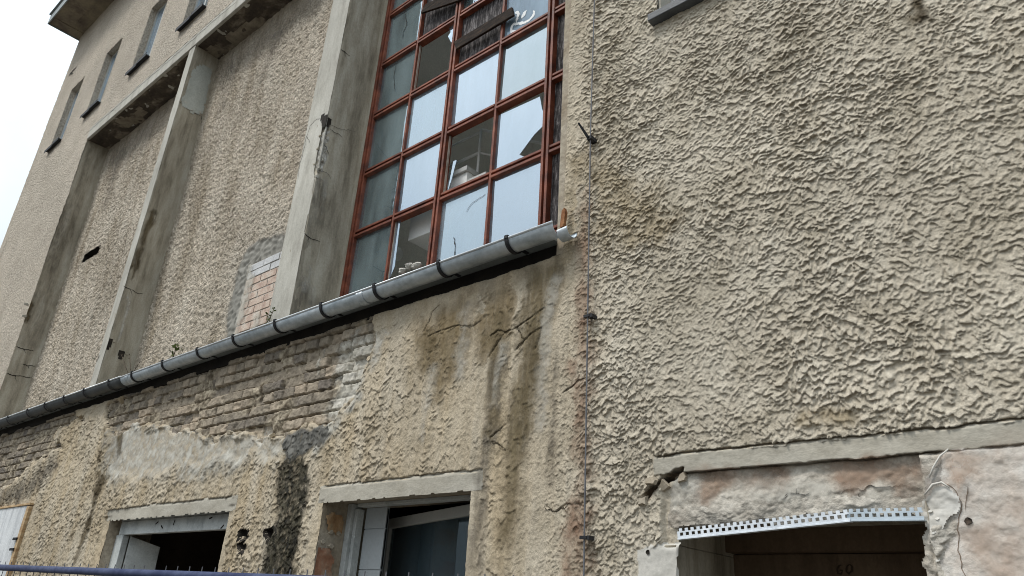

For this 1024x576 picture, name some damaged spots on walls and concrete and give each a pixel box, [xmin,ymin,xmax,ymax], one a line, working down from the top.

peeling [207,16,266,59]
spalling [92,329,128,360]
flaking render [107,316,376,444]
crack [427,309,542,357]
damp [416,264,561,536]
flaking render [0,412,84,488]
damp [74,334,382,575]
flaking render [236,523,276,555]
flaking render [638,466,688,506]
flaking render [921,449,961,576]
crack [949,485,968,576]